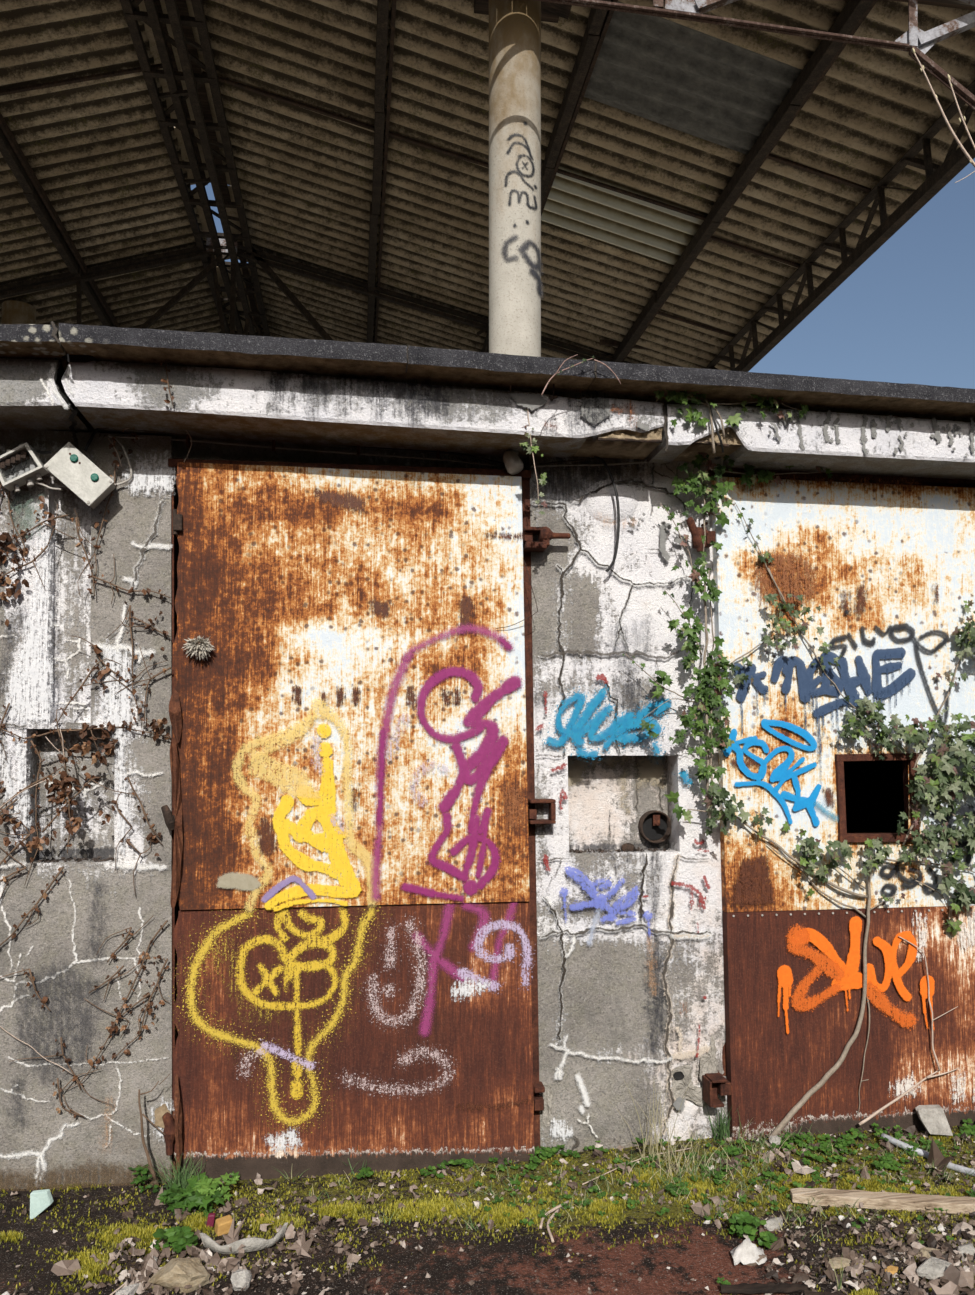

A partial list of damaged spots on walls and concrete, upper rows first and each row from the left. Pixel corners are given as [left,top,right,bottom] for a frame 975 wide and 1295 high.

crack [40,358,79,450]
corrosion [314,488,366,513]
corrosion [484,530,524,541]
crack [532,401,694,836]
corrosion [840,584,867,616]
corrosion [321,685,359,706]
corrosion [406,686,418,708]
corrosion [256,817,277,858]
crack [116,862,166,871]
crack [0,862,144,1012]
crack [537,853,712,1136]
crack [0,1056,165,1186]